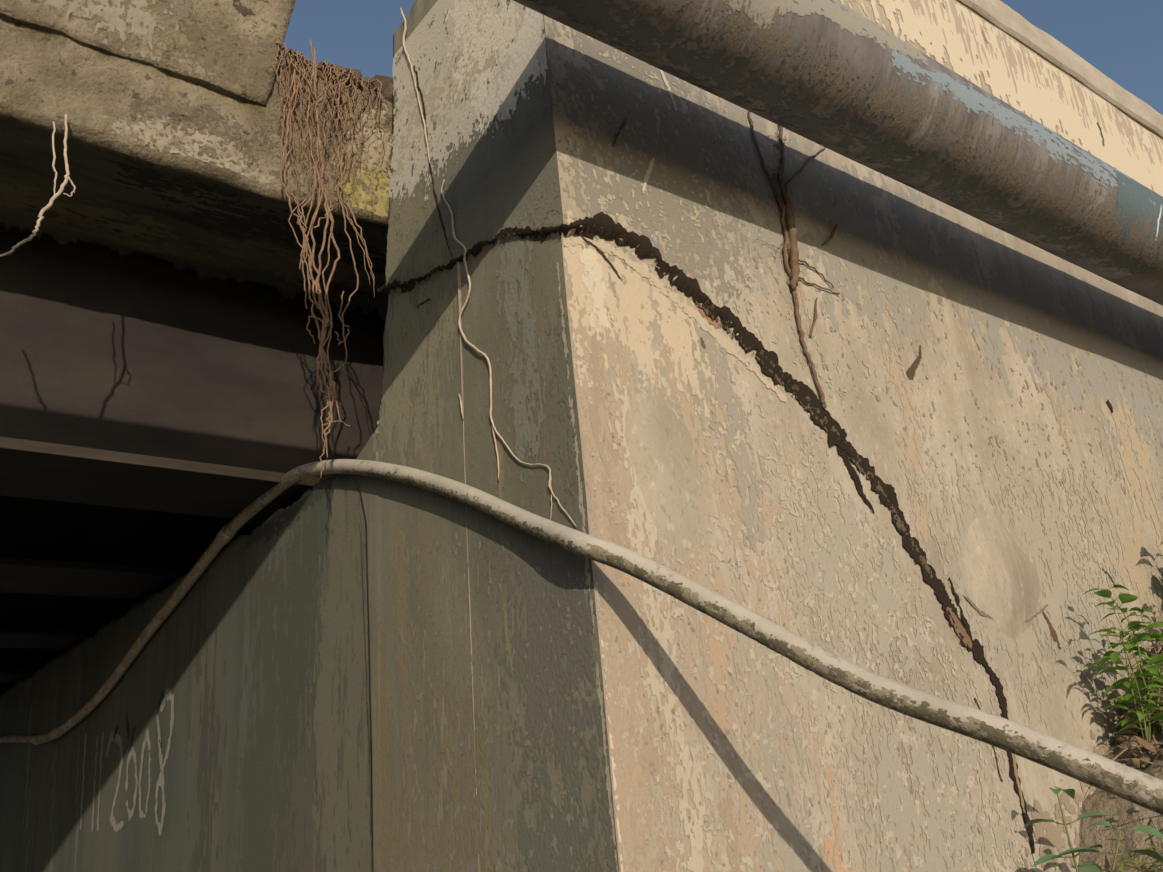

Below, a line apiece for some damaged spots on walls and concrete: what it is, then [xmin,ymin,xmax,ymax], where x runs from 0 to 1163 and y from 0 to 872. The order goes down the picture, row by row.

water stain [109,0,1163,757]
crack [377,65,1048,719]
water stain [401,516,1096,872]
crack [993,746,1035,854]